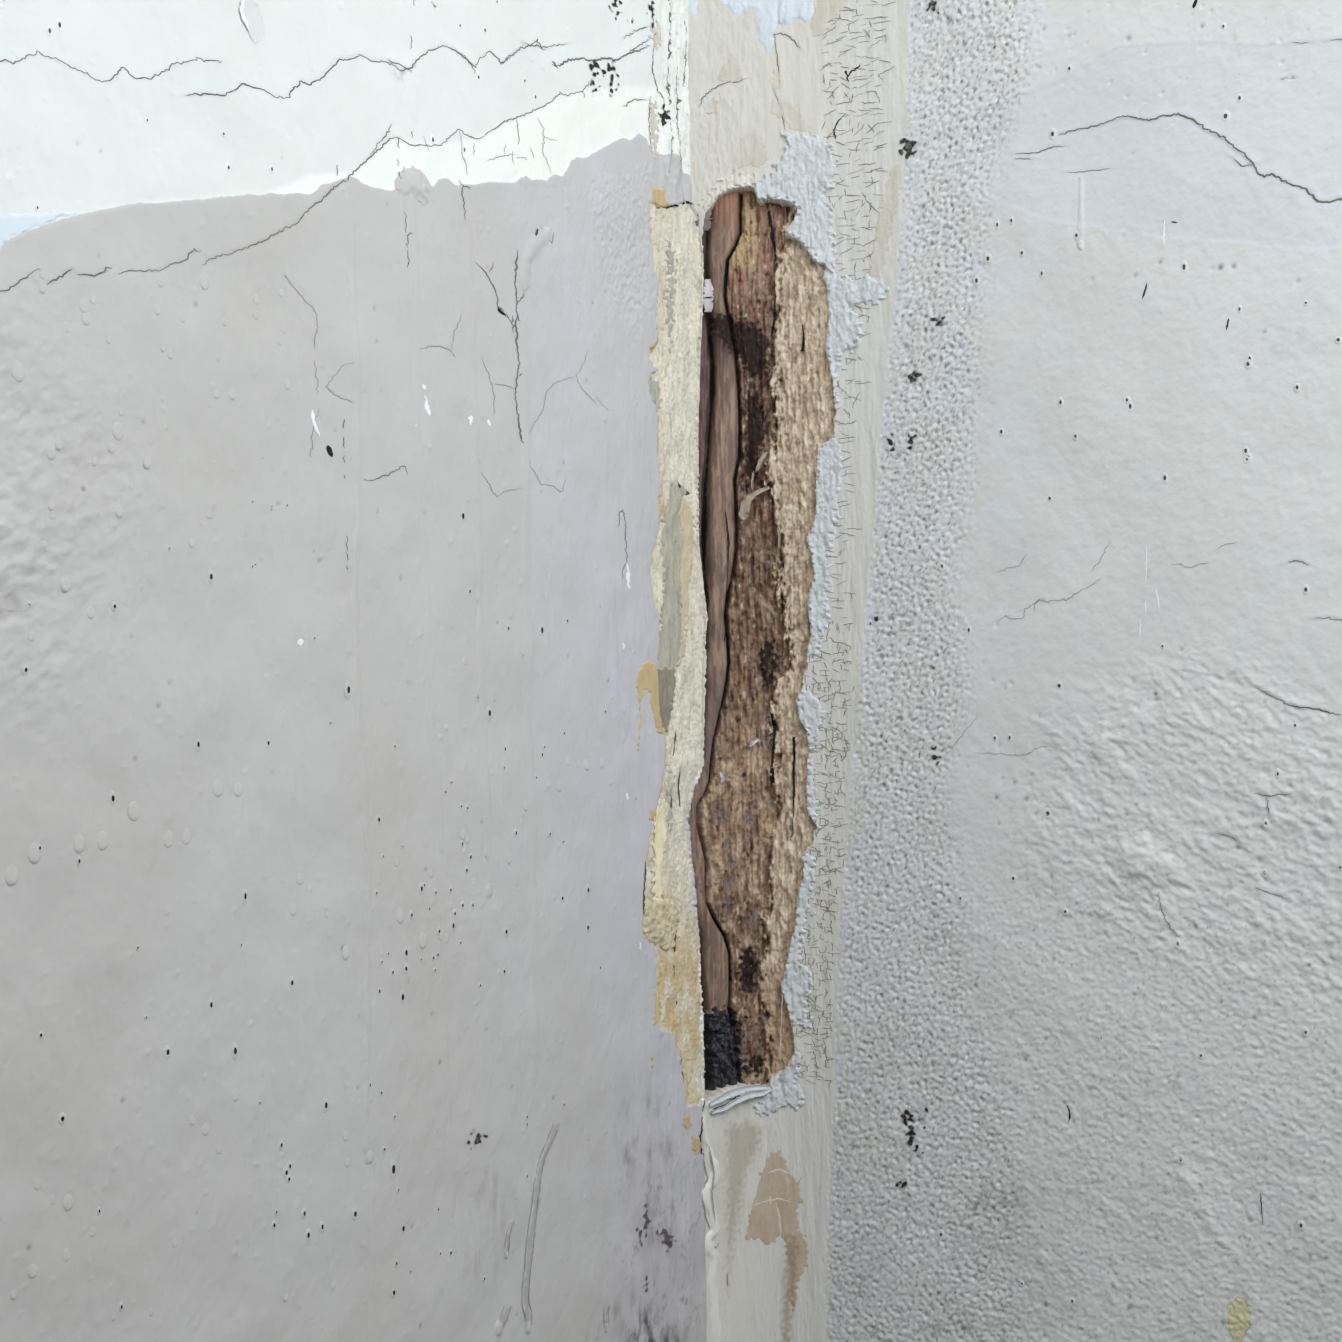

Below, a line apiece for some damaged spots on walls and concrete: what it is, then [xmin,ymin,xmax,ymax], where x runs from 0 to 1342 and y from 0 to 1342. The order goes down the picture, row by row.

crack [0,0,894,1085]
spalling [635,70,903,1155]
peeling [810,0,847,37]
crack [1016,113,1342,203]